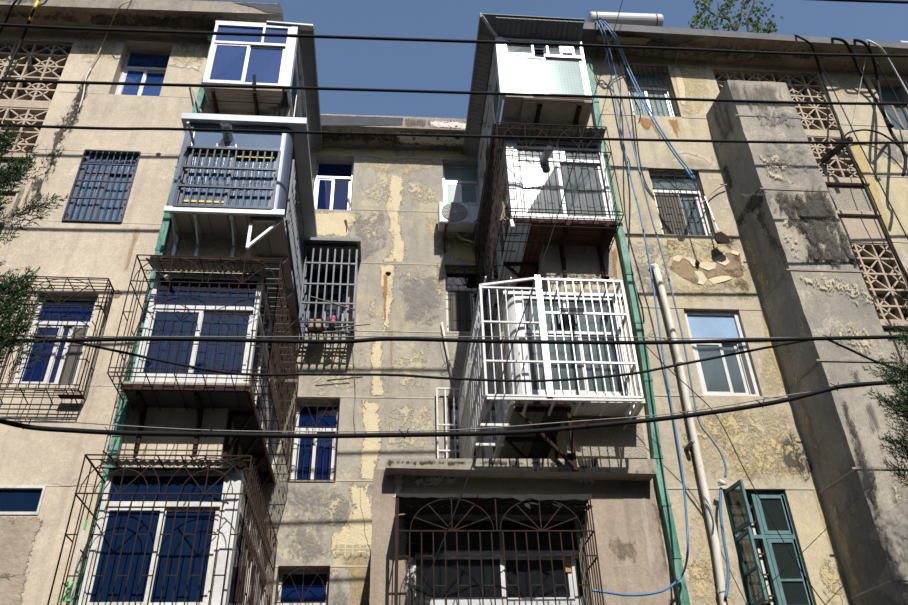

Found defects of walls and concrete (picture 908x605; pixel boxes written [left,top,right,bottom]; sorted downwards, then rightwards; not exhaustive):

damp [712,82,806,182]
spalling [637,231,768,300]
damp [737,186,858,267]
peeling [301,147,479,605]
peeling [678,404,810,486]
mould [778,434,812,481]
peeling [687,498,735,605]
peeling [814,490,854,603]